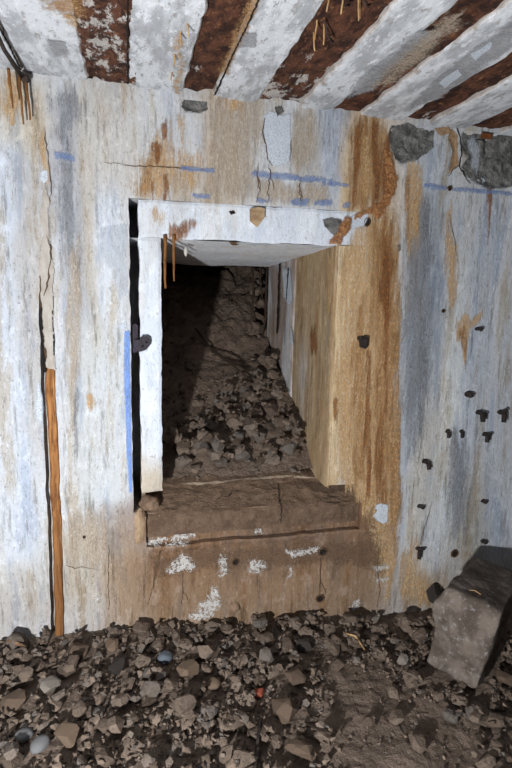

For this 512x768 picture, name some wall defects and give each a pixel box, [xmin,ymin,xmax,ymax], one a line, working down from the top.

peeling [411,22,512,108]
crack [105,162,211,172]
rust [139,120,198,200]
crack [256,118,274,203]
spalling [323,123,512,245]
rust [163,220,196,288]
crack [39,236,51,373]
rust [327,116,429,607]
leakage [147,533,389,583]
efflorescence [185,587,221,621]